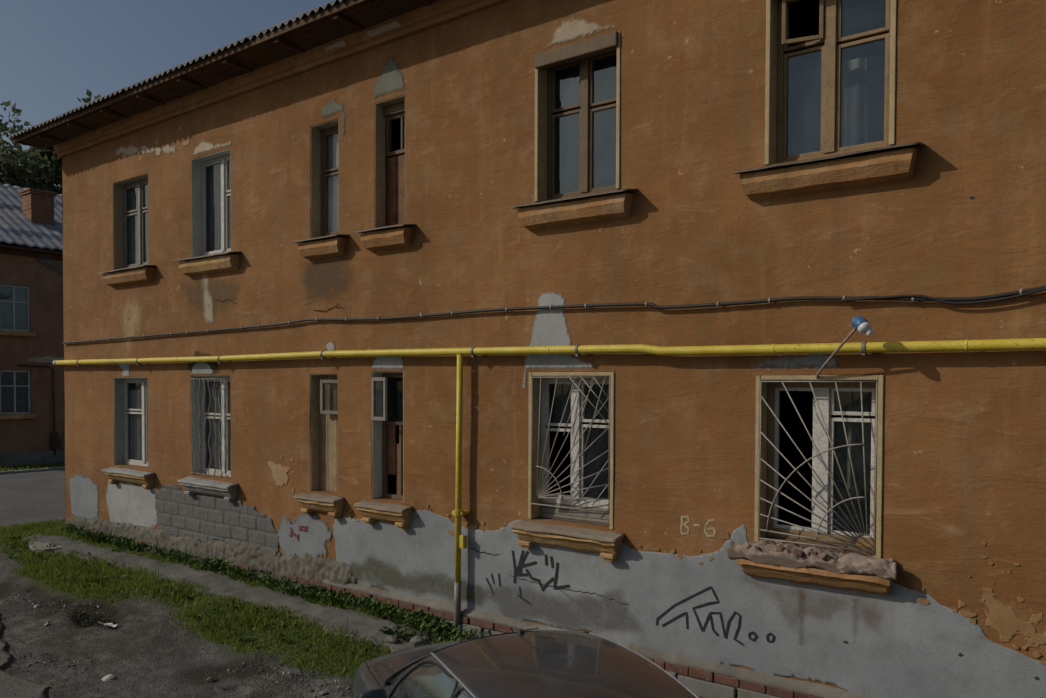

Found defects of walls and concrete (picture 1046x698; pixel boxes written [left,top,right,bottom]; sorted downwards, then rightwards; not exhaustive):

peeling [549,18,617,46]
peeling [115,126,190,160]
peeling [268,455,295,492]
flaking render [67,484,357,585]
peeling [952,582,1046,650]